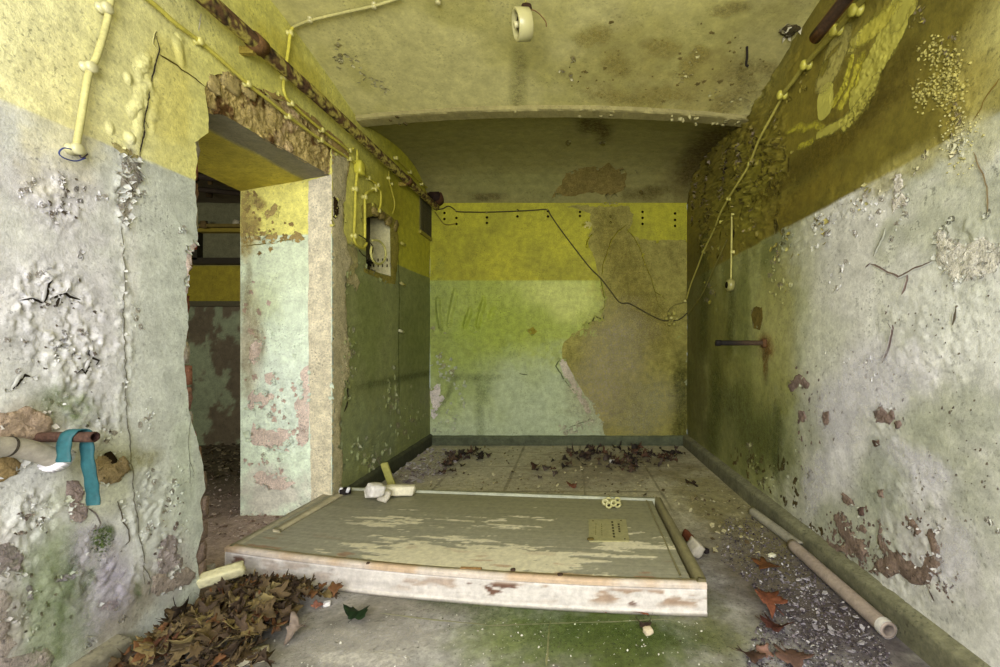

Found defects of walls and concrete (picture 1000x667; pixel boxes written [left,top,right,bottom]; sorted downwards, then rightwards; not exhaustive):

crack [140,31,205,152]
peeling [18,141,147,229]
crack [19,280,83,309]
peeling [242,89,400,501]
flaking render [552,70,836,436]
peeling [931,216,1000,292]
peeling [0,387,131,487]
crack [75,227,153,594]
spalling [731,355,999,603]